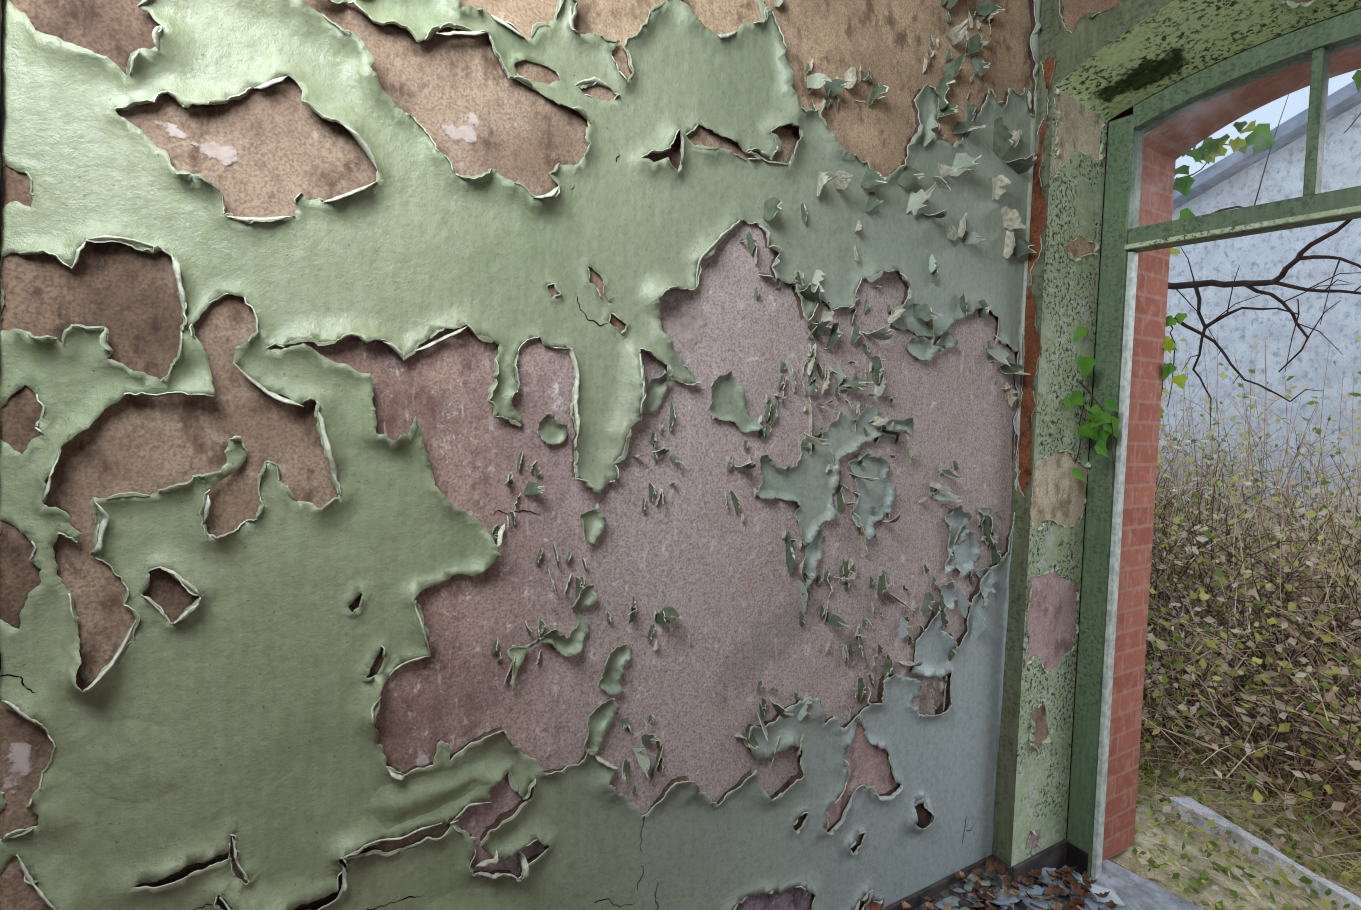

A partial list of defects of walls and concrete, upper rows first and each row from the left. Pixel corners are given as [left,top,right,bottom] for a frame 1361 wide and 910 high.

peeling [9,0,162,75]
peeling [1059,0,1120,33]
peeling [2,157,34,210]
peeling [113,75,378,224]
peeling [306,0,665,199]
peeling [641,0,1041,261]
peeling [1051,88,1105,179]
peeling [0,235,341,693]
peeling [266,197,1031,882]
peeling [1030,450,1091,530]
peeling [1025,569,1080,674]
peeling [733,886,812,910]